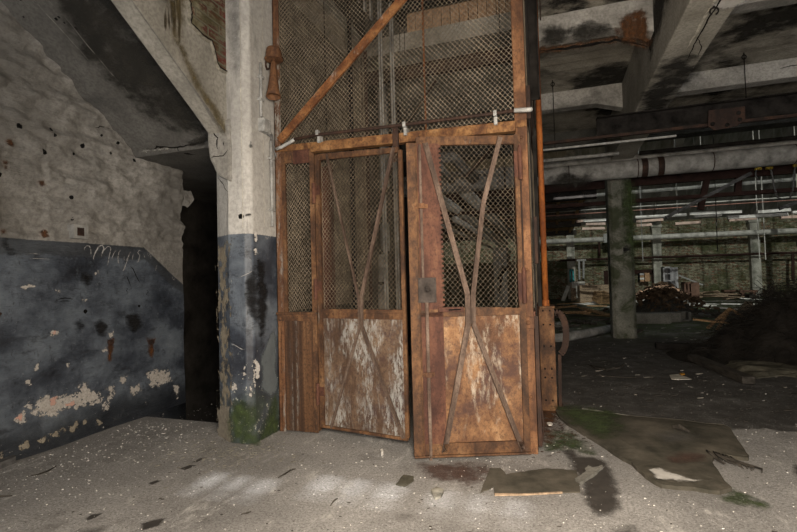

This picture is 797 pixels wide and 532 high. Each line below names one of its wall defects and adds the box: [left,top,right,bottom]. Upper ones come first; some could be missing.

spalling [186,0,227,74]
water stain [542,22,611,45]
rust [616,8,650,43]
water stain [649,0,667,58]
crack [686,0,721,56]
water stain [725,4,797,43]
water stain [573,62,628,89]
water stain [245,259,268,337]
peeling [216,242,237,442]
peeling [13,369,179,425]
peeling [243,359,260,397]
spalling [18,419,103,451]